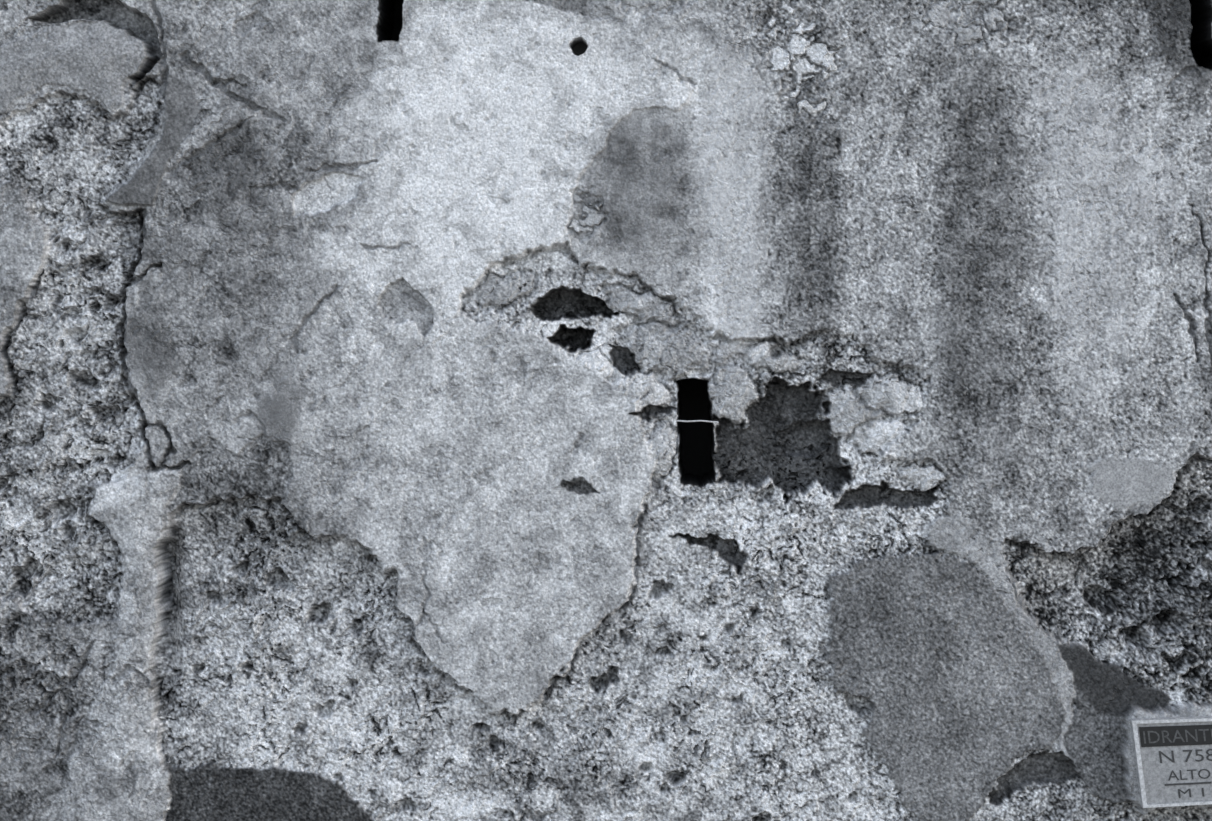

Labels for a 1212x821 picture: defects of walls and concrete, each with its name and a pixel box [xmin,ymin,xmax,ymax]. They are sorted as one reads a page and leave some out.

crack [150,0,287,177]
peeling [754,0,847,131]
spalling [0,20,201,627]
crack [1173,204,1212,369]
spalling [150,186,980,821]
spalling [1002,454,1212,710]
spalling [968,739,1212,821]